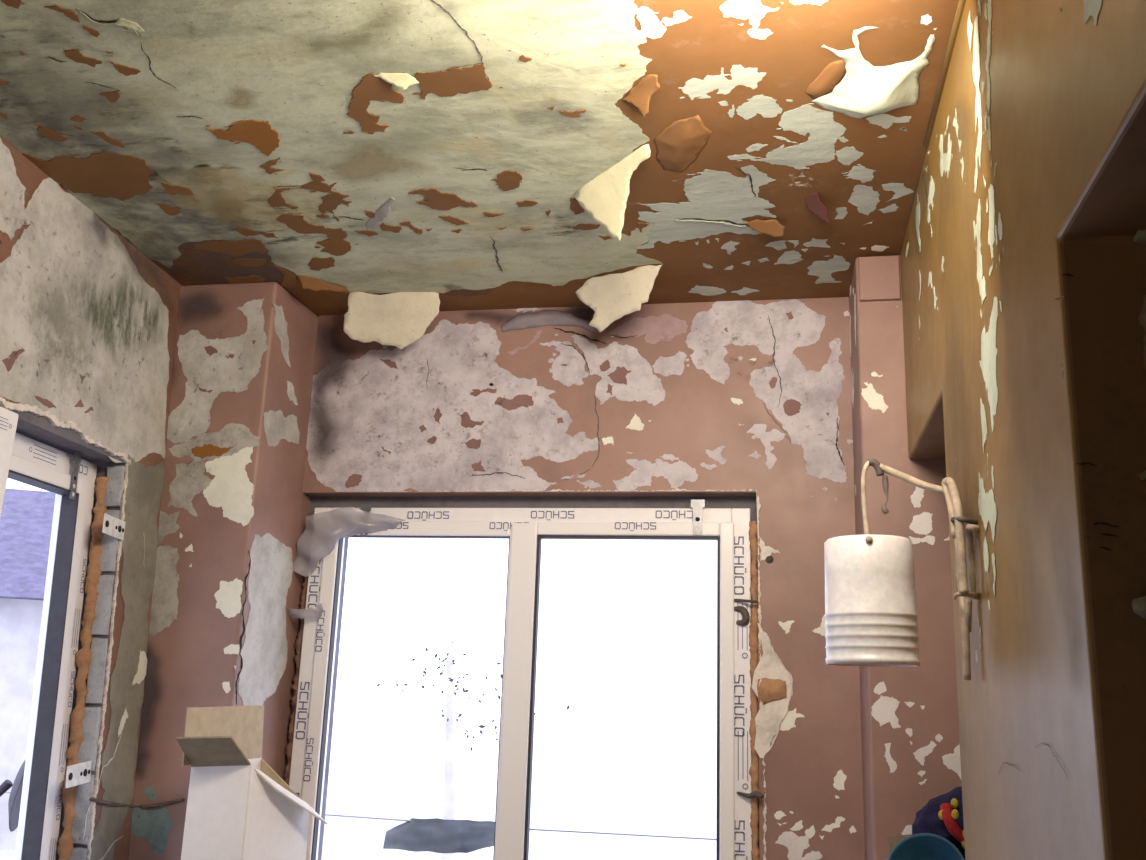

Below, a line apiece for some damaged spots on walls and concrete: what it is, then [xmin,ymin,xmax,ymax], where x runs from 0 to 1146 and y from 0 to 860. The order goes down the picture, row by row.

crack [76,9,177,89]
crack [431,0,493,86]
peeling [1083,0,1102,26]
peeling [719,27,936,216]
peeling [924,167,935,236]
peeling [843,285,856,357]
spalling [919,256,944,310]
peeling [936,0,1004,610]
peeling [0,0,850,860]
peeling [861,372,888,413]
peeling [909,487,950,545]
peeling [871,682,961,785]